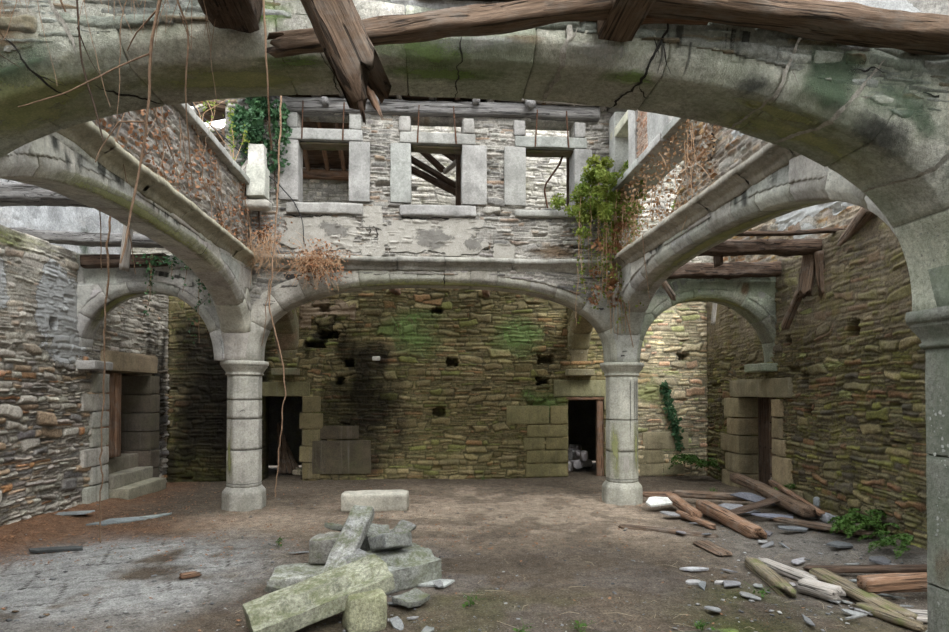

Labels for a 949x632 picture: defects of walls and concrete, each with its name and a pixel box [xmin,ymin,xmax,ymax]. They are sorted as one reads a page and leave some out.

crack [455,36,463,97]
crack [609,23,671,109]